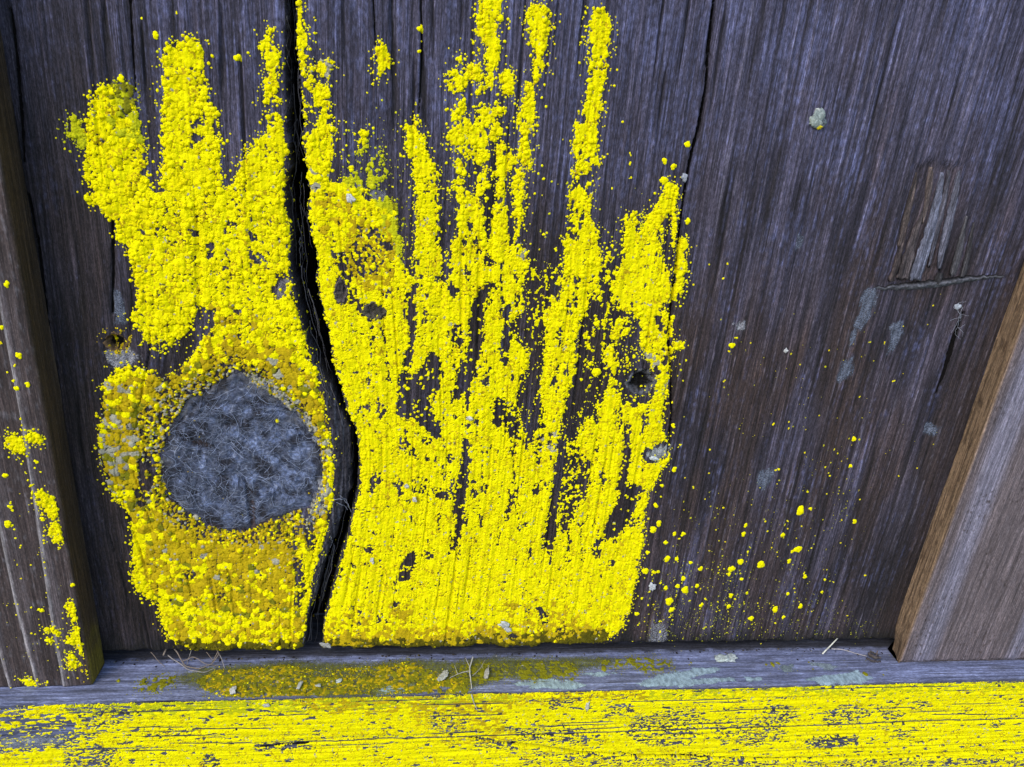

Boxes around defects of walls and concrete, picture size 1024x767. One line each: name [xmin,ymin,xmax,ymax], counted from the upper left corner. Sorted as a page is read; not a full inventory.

crack [282,0,360,644]
crack [667,0,715,451]
crack [877,274,1004,291]